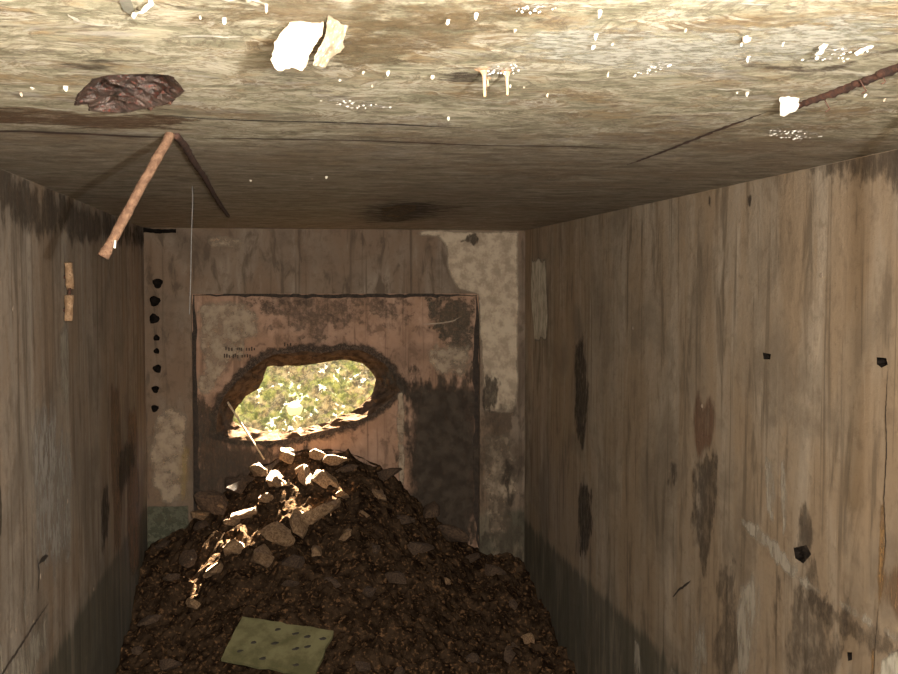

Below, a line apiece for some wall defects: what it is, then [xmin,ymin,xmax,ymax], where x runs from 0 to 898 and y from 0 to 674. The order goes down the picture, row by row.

crack [68,0,134,26]
peeling [271,15,349,71]
spalling [63,74,185,113]
crack [0,112,766,165]
hole [211,343,406,448]